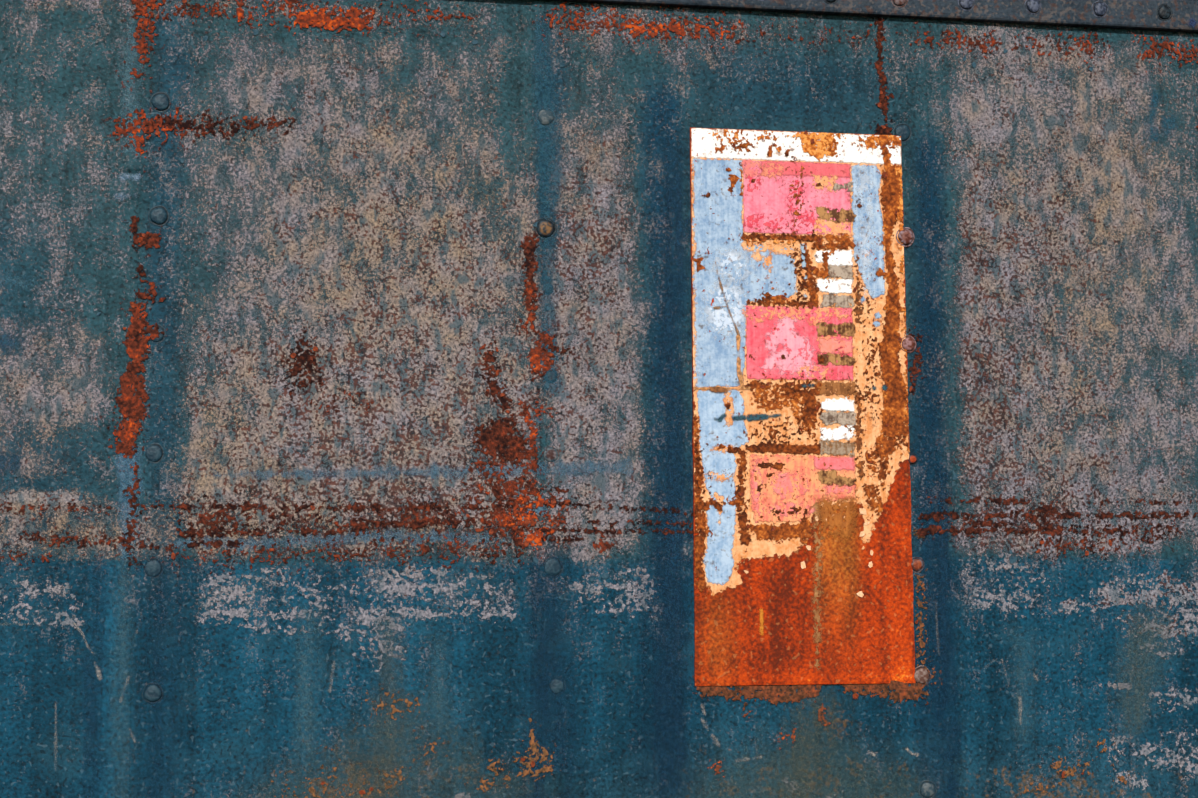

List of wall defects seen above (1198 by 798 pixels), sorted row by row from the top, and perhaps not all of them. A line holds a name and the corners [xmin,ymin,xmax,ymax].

rust [124,0,478,89]
rust [540,1,887,50]
rust [109,107,297,159]
peeling [0,0,827,672]
rust [0,216,825,592]
rust [910,494,1198,559]
rust [842,571,936,704]
rust [696,684,831,726]